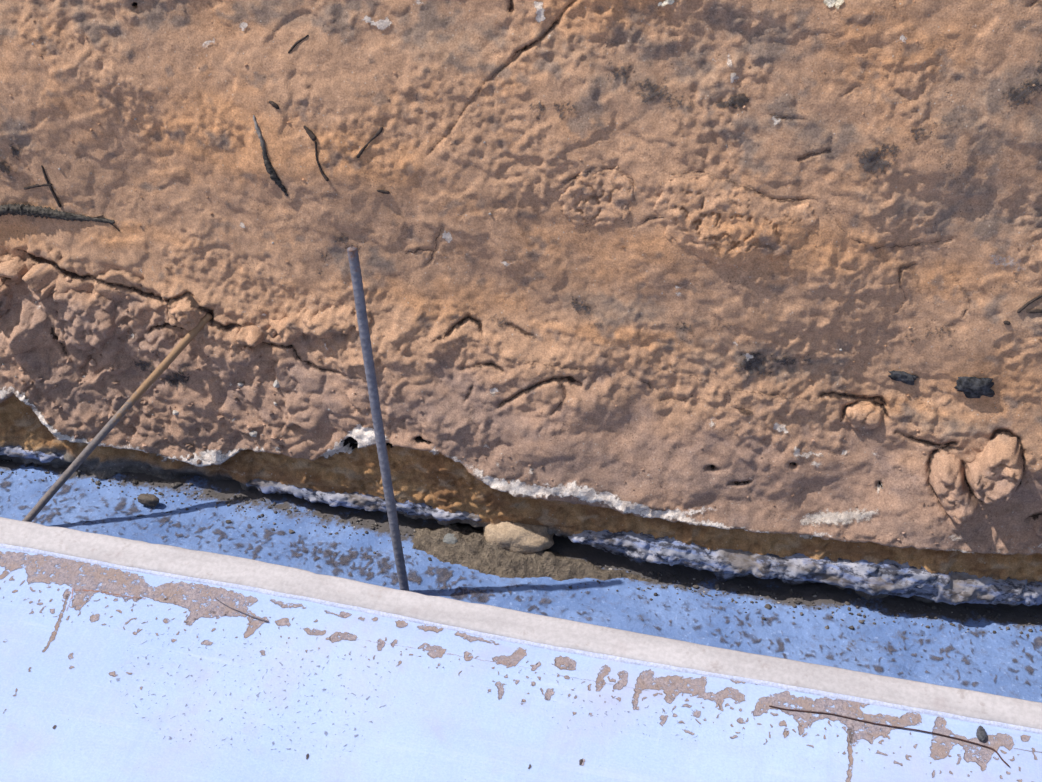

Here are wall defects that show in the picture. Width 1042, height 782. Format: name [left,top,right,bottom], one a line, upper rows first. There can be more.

crack [484,20,558,84]
crack [406,233,440,260]
crack [17,249,240,332]
crack [51,328,67,354]
crack [262,342,348,378]
crack [434,316,482,341]
crack [460,361,588,407]
spalling [0,474,595,620]
peeling [0,551,1037,782]
spalling [1010,631,1042,685]
crack [826,712,875,782]